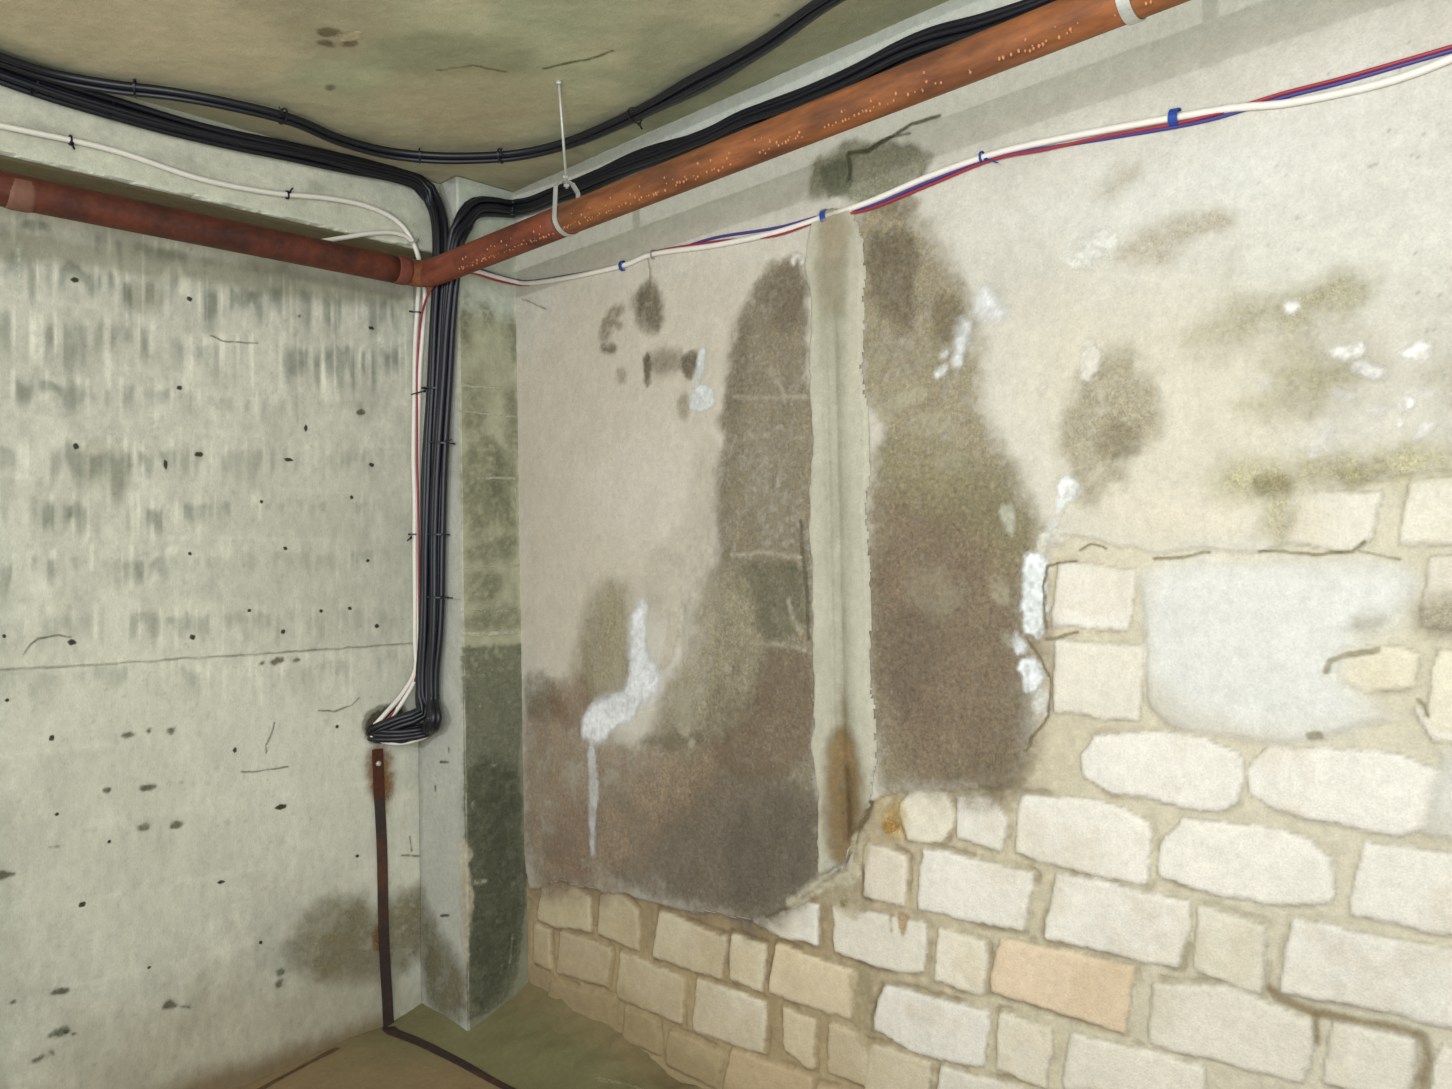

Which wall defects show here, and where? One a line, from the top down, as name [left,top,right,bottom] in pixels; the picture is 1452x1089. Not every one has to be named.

leakage [1240,278,1361,327]
leakage [1290,342,1386,389]
leakage [1401,341,1431,359]
leakage [811,141,1156,791]
leakage [307,253,819,1021]
rust [368,748,394,799]
rust [826,730,861,862]
spalling [788,832,867,906]